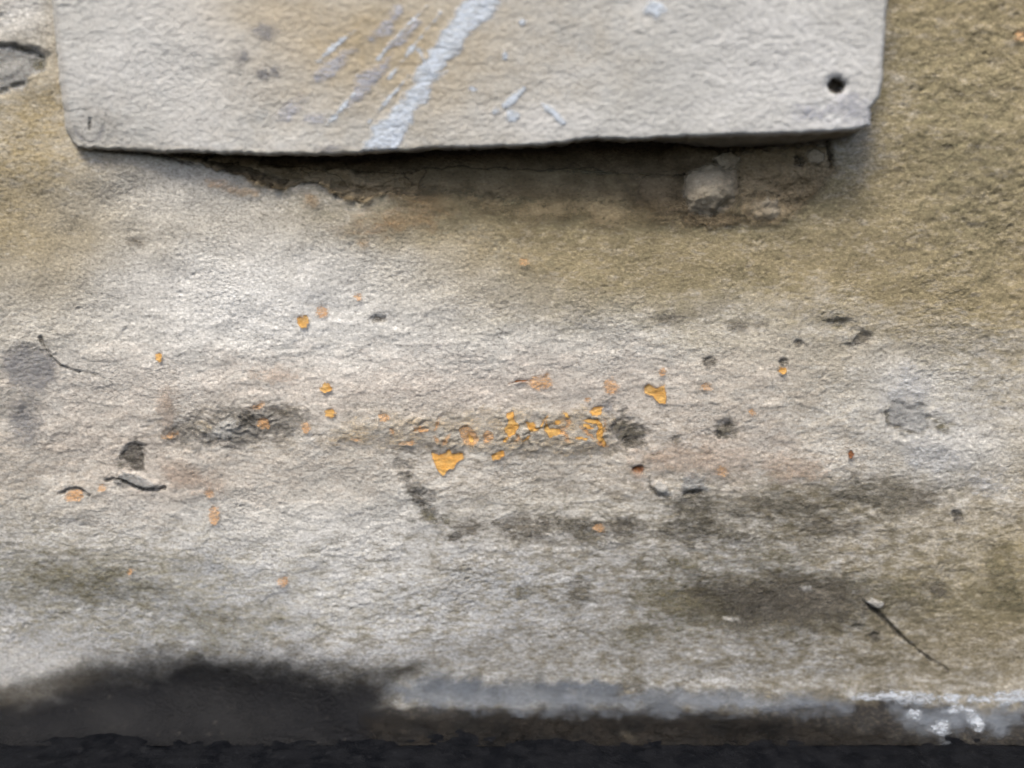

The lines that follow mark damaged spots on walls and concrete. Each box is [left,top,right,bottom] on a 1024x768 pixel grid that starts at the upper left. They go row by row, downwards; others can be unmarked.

flaking render [165,141,836,227]
flaking render [113,438,154,489]
crack [865,598,948,672]
water stain [0,655,767,746]
efflorescence [853,690,1024,734]